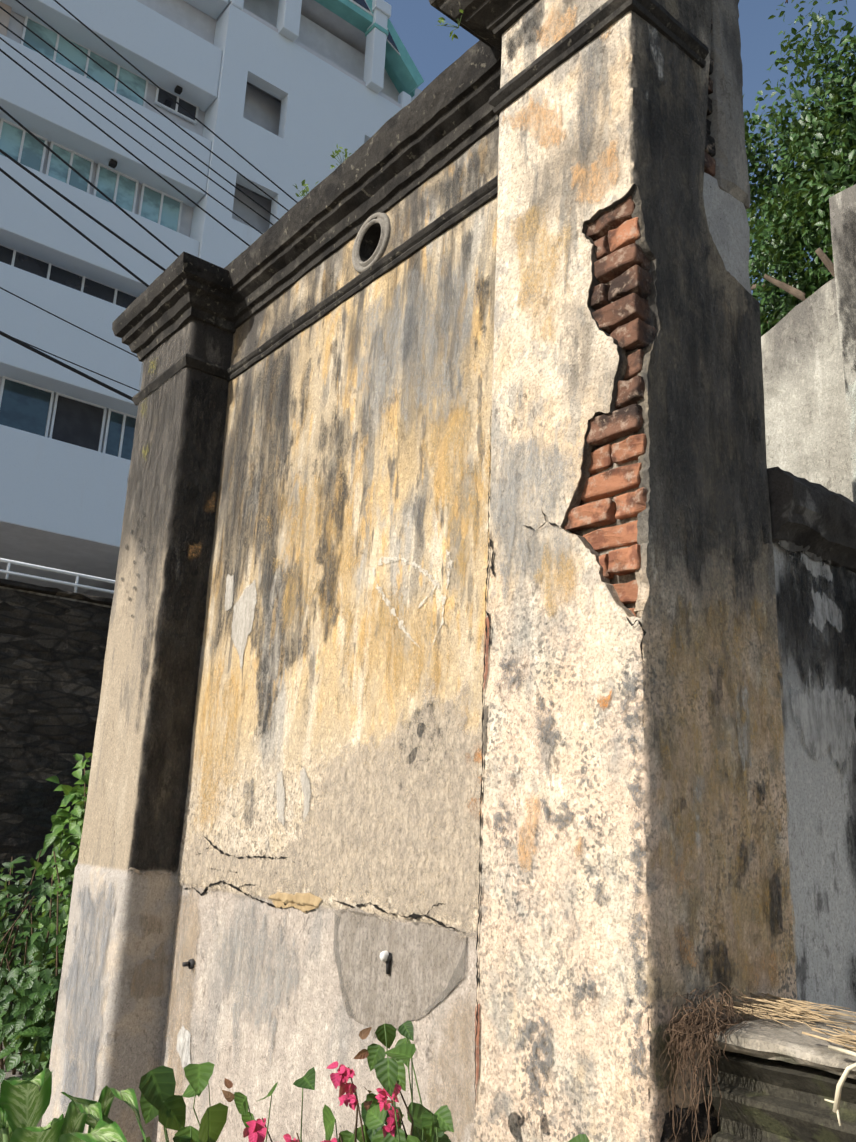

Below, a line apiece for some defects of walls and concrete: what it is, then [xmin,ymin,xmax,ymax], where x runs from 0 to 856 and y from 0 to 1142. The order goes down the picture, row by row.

damp [357,257,490,429]
spalling [563,196,657,617]
damp [638,29,770,612]
damp [127,334,357,873]
damp [777,551,856,729]
crack [126,410,495,1108]
mould [400,703,450,774]
damp [765,869,783,934]
damp [847,816,856,877]